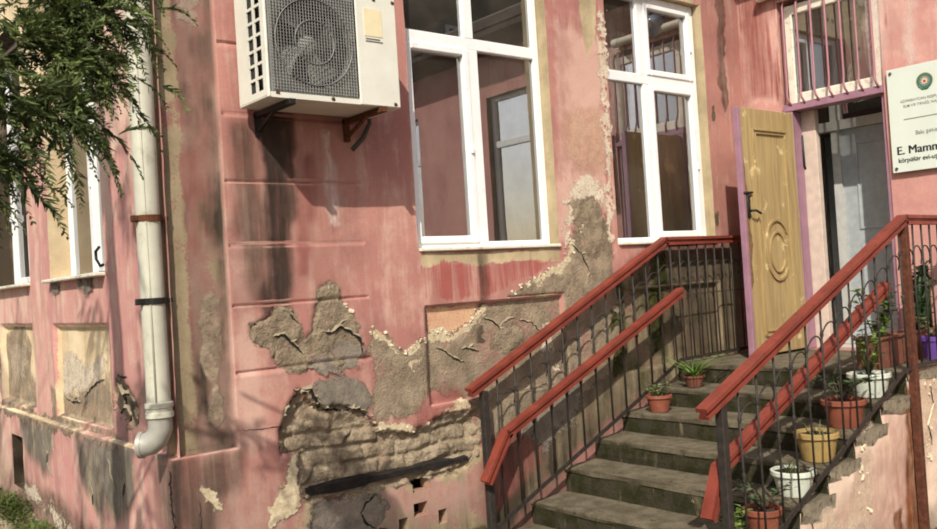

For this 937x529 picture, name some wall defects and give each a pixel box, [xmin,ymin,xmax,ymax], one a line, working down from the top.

damp [242,112,295,318]
peeling [248,10,621,505]
peeling [0,326,139,451]
damp [22,483,79,529]
damp [156,460,181,529]
damp [190,463,225,529]
spalling [200,486,223,511]